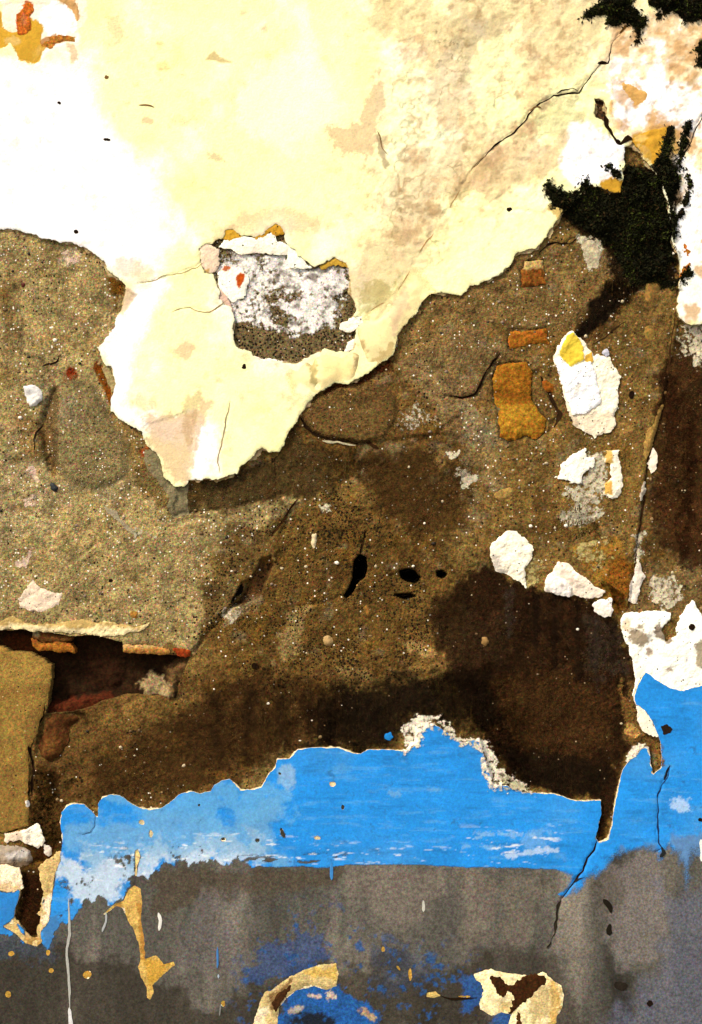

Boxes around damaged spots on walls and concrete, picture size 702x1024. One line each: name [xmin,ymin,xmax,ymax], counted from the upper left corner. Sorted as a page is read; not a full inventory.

crack [471,25,627,170]
crack [604,115,633,145]
damp [550,205,645,340]
damp [662,229,681,292]
spalling [0,216,702,938]
damp [93,557,635,840]
crack [655,766,670,857]
crack [547,839,598,948]
crack [603,899,613,936]